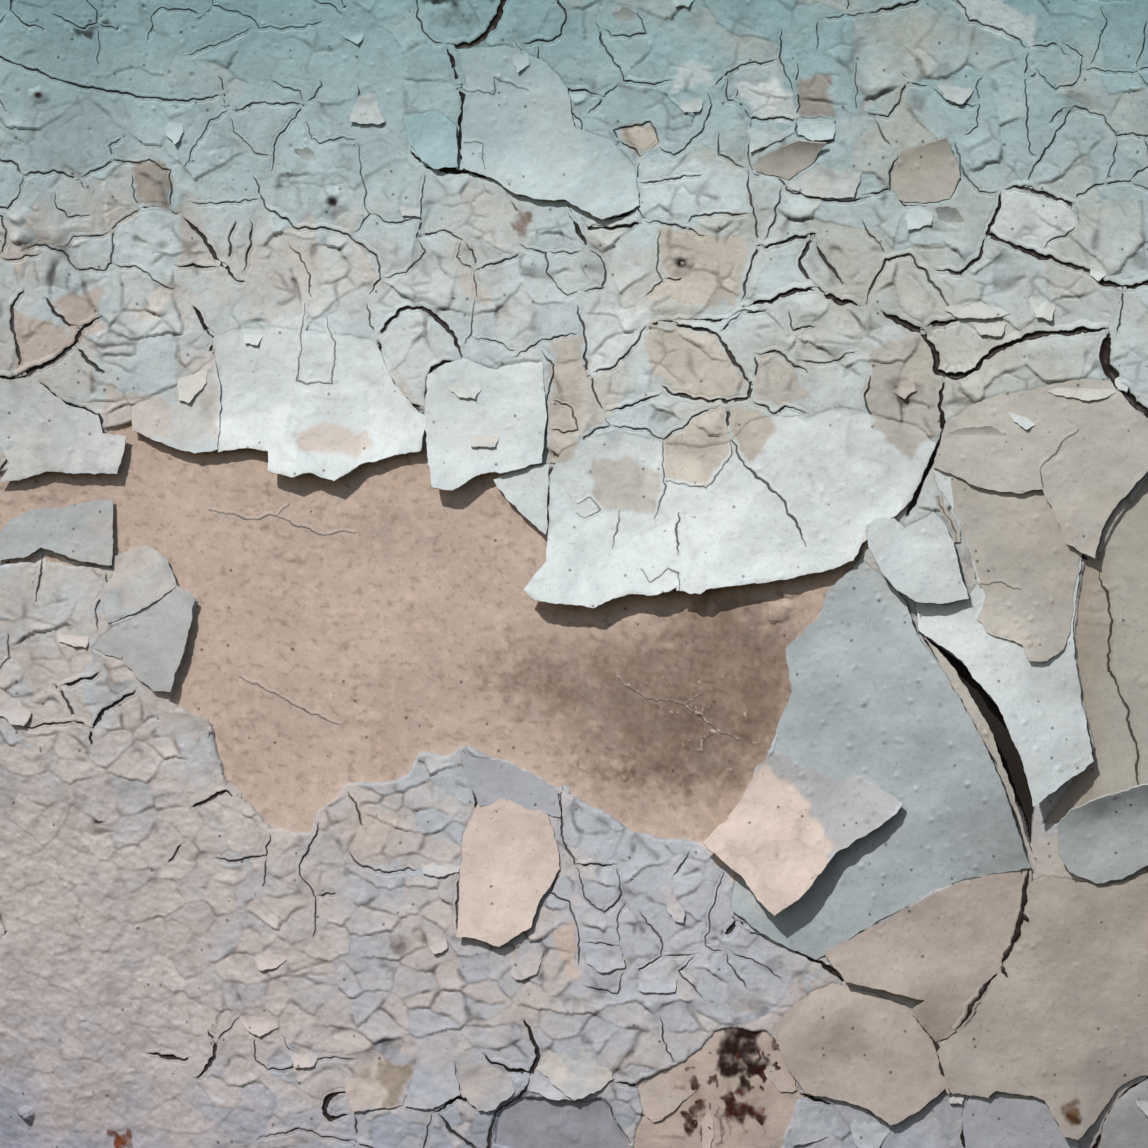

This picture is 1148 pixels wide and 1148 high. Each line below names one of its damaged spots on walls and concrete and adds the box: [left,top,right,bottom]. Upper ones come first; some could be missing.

crack [0,0,1148,591]
crack [0,548,114,633]
crack [20,668,139,750]
crack [188,780,242,811]
peeling [0,327,1148,1148]
crack [1081,553,1142,786]
crack [212,817,339,942]
crack [547,785,846,1001]
crack [912,868,1032,1094]
corrosion [107,1129,131,1148]
crack [145,1013,543,1148]
corrosion [681,1027,780,1140]